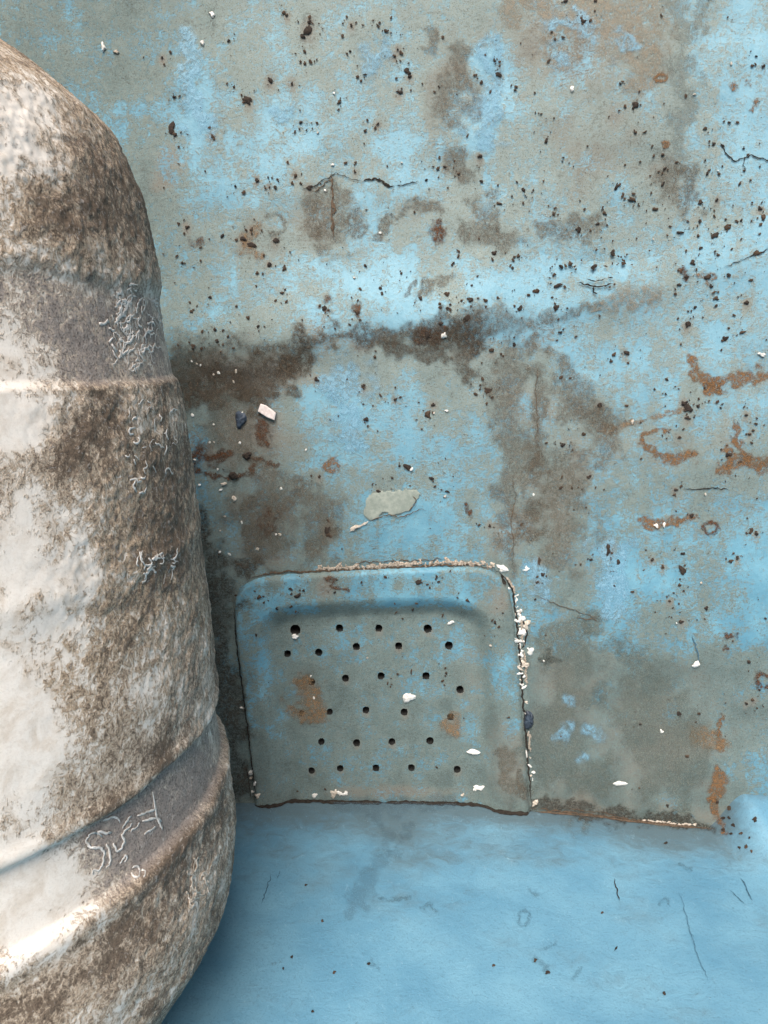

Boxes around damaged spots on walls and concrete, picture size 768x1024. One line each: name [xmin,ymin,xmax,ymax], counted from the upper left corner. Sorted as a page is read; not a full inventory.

crack [721,144,768,167]
crack [304,170,417,236]
rust [687,354,768,396]
rust [600,408,698,465]
rust [716,423,768,475]
peeling [349,489,424,532]
water stain [170,285,661,798]
crack [234,482,713,829]
water stain [516,611,715,832]
rust [707,765,728,834]